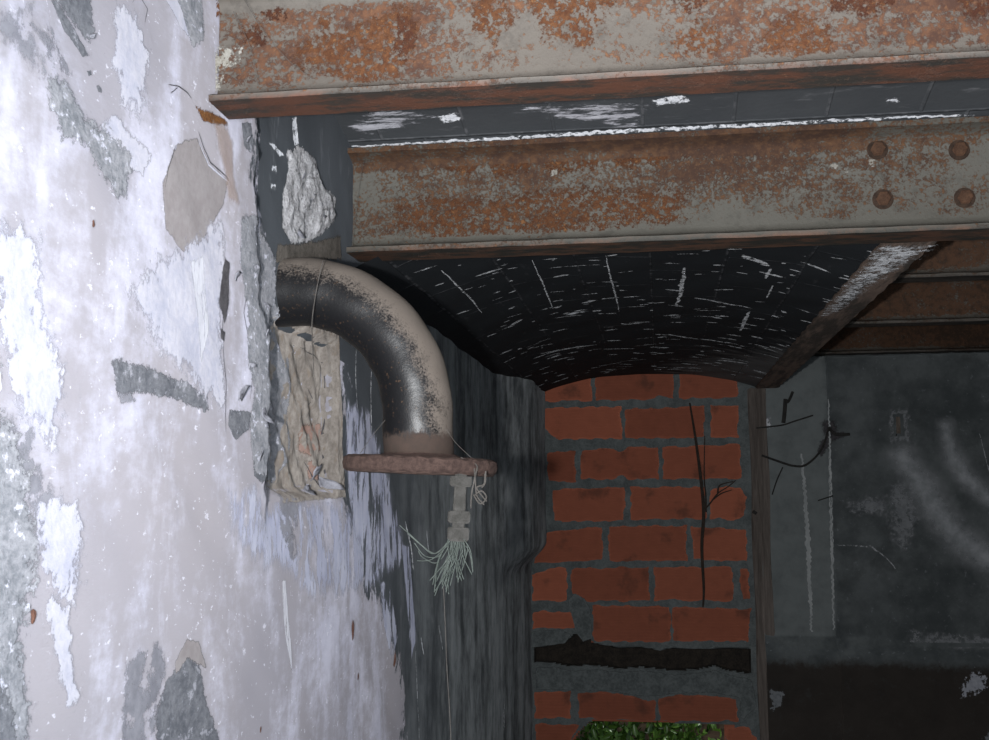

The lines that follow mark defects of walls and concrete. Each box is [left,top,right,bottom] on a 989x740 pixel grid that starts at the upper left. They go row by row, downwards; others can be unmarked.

corrosion [292,1,421,83]
corrosion [472,0,520,47]
corrosion [527,0,616,53]
corrosion [671,0,724,58]
corrosion [830,0,895,17]
peeling [0,0,133,200]
peeling [163,138,227,252]
corrosion [390,160,688,238]
spalling [219,117,346,560]
peeling [111,358,209,412]
peeling [0,410,54,740]
peeling [122,639,219,740]